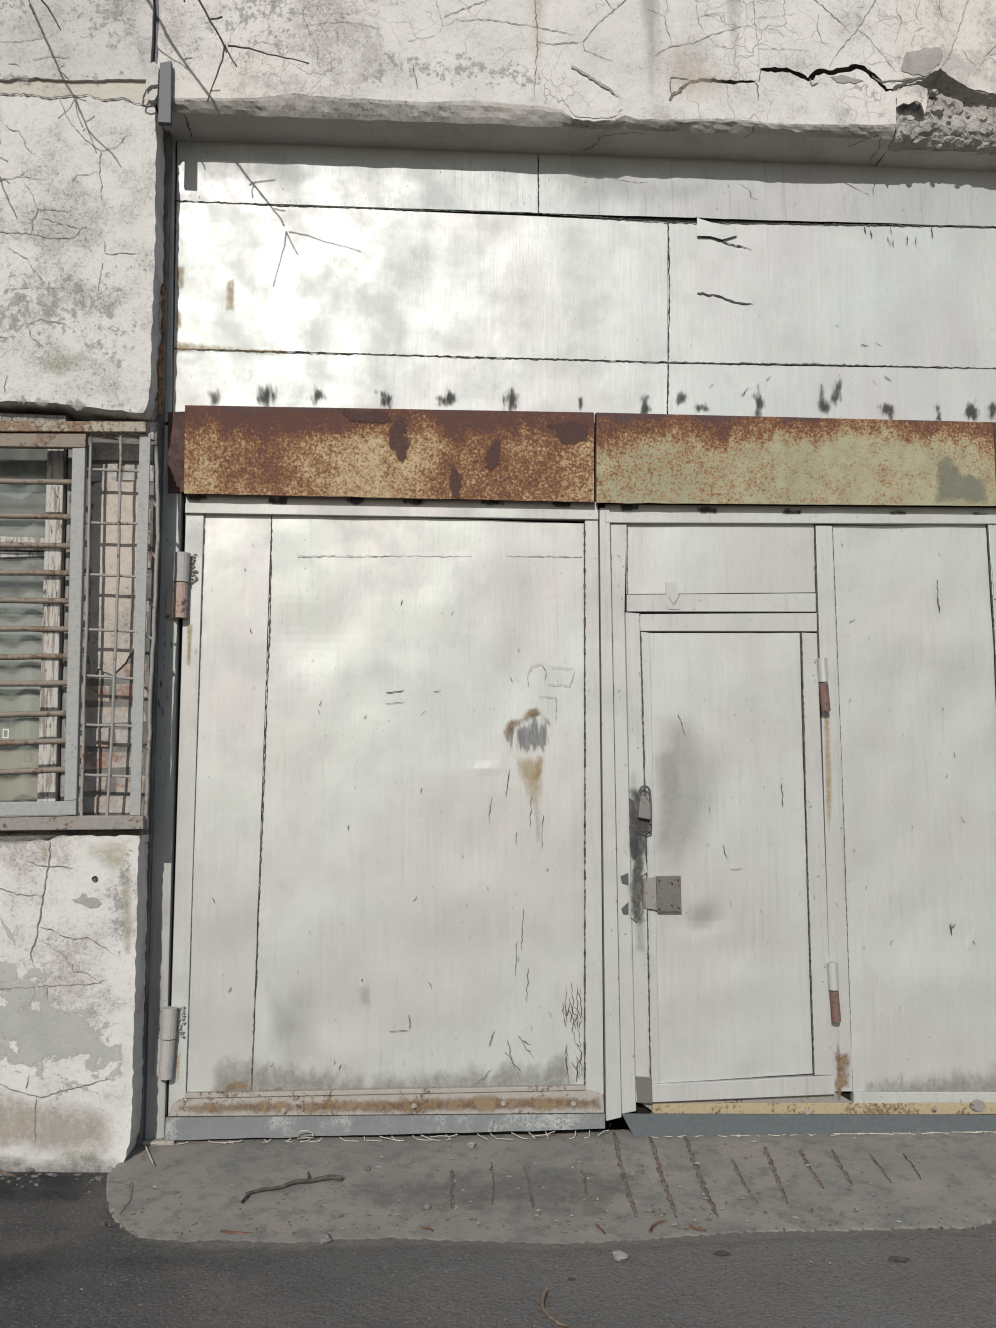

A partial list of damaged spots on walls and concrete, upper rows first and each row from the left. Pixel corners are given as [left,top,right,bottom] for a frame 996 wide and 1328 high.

crack [302,0,996,139]
spalling [887,47,996,155]
crack [0,37,151,346]
rust [342,409,410,462]
rust [548,421,588,444]
rust [449,464,461,498]
rust [505,709,539,739]
crack [0,841,113,997]
peeling [72,893,101,908]
peeling [0,961,121,1146]
crack [1,1074,110,1137]
rust [189,1087,599,1115]